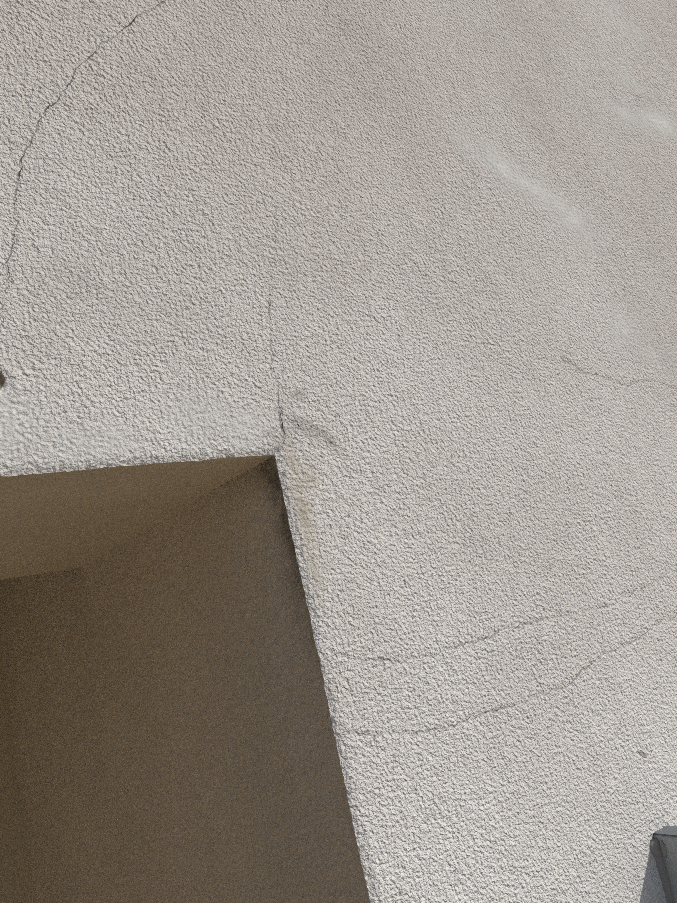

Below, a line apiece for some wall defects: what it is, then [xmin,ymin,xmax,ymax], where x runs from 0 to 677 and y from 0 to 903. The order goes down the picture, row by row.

crack [6,45,100,279]
crack [278,398,332,450]
crack [416,705,514,733]